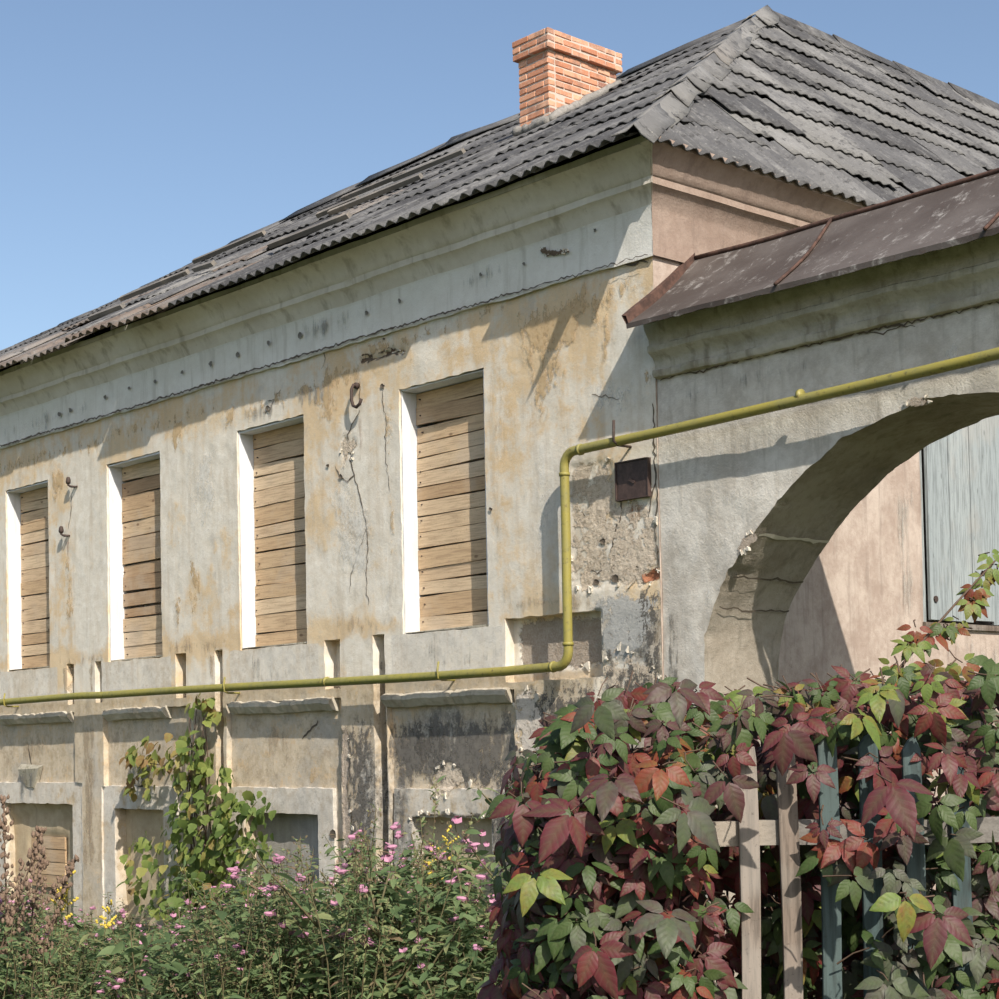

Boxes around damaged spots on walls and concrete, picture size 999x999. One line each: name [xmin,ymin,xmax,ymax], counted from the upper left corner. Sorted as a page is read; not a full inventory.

crack [0,254,648,447]
peeling [298,329,430,419]
peeling [518,281,635,414]
crack [335,387,390,601]
flaking render [517,457,662,696]
leakage [534,589,678,727]
leakage [347,721,375,865]
leakage [386,714,525,843]